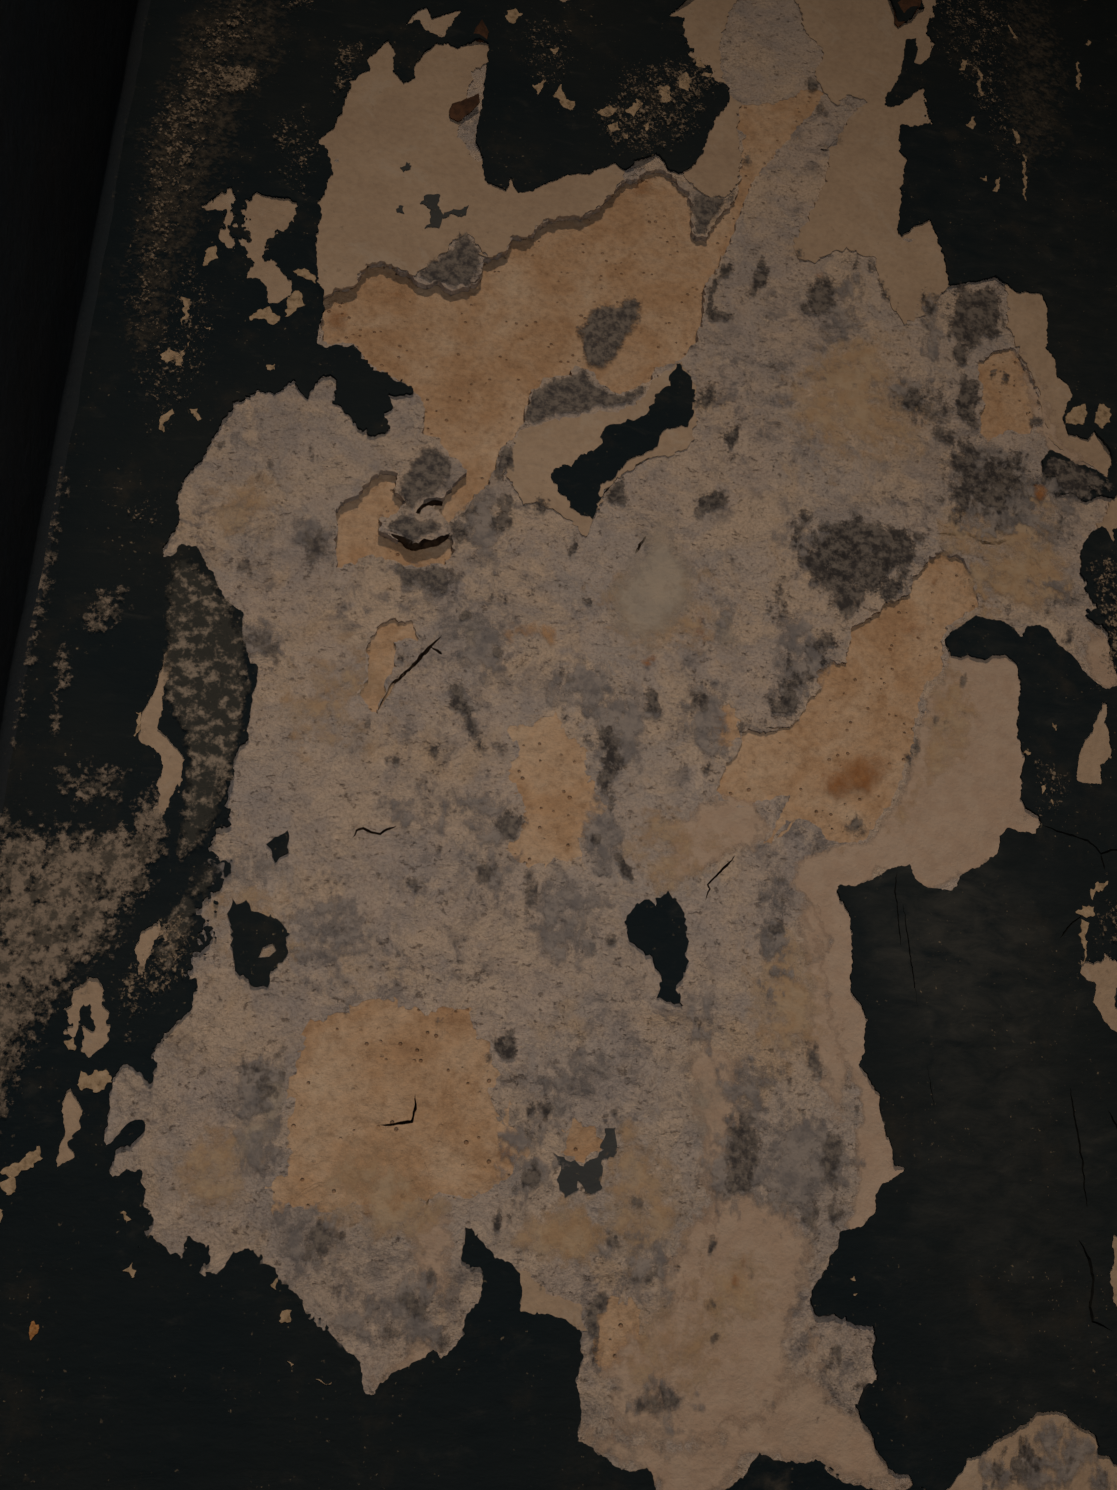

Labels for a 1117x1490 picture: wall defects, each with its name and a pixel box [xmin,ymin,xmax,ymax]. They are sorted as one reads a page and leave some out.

peeling [202,188,305,325]
flaking render [317,89,824,522]
water stain [379,254,1112,971]
peeling [134,650,185,820]
flaking render [506,711,607,868]
flaking render [716,552,978,844]
peeling [1076,703,1112,784]
peeling [63,977,111,1058]
peeling [1075,881,1117,1032]
peeling [56,1089,83,1167]
flaking render [265,997,530,1214]
peeling [947,1411,1117,1490]